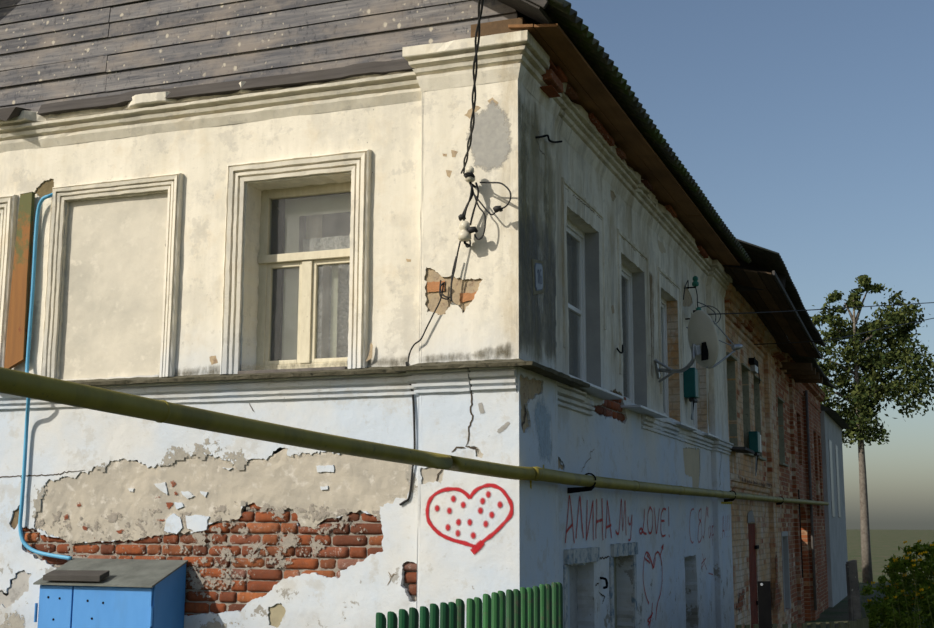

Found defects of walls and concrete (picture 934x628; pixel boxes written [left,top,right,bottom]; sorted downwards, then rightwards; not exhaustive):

spalling [540,60,579,100]
flaking render [465,97,511,171]
spalling [588,113,627,160]
damp [519,101,557,357]
flaking render [425,268,482,315]
crack [452,385,476,452]
flaking render [516,375,563,470]
flaking render [594,391,626,422]
flaking render [10,438,444,628]
flaking render [0,570,31,628]